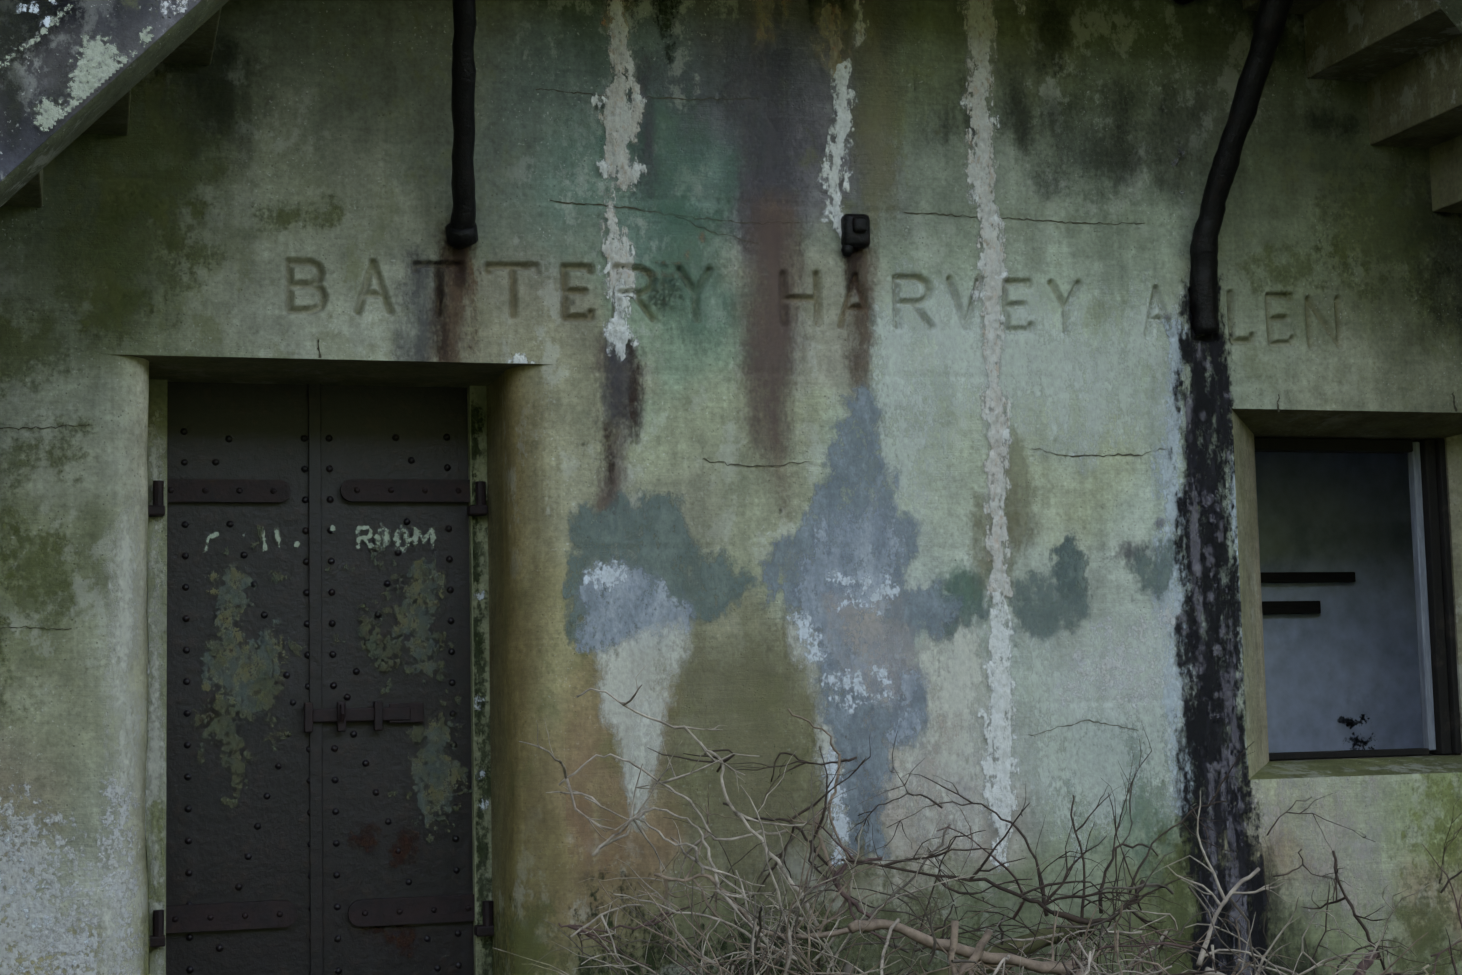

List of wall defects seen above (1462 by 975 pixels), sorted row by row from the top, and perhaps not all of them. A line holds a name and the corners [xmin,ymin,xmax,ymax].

damp [591,0,676,360]
damp [815,0,869,238]
corrosion [597,343,643,514]
damp [870,0,1248,973]
peeling [192,547,303,808]
peeling [334,539,489,843]